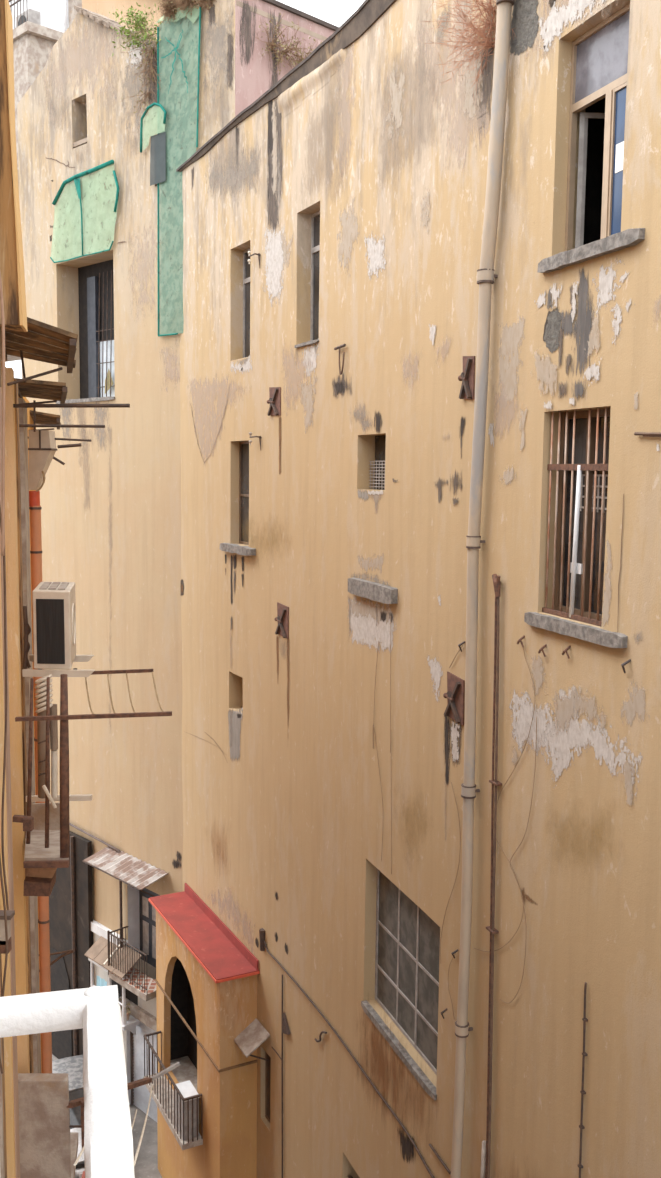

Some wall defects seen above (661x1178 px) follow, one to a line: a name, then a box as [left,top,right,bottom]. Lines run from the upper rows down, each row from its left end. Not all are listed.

flaking render [510,0,606,55]
damp [205,1,283,231]
peeling [337,197,387,278]
flaking render [488,259,631,450]
flaking render [348,596,396,653]
flaking render [509,655,650,805]